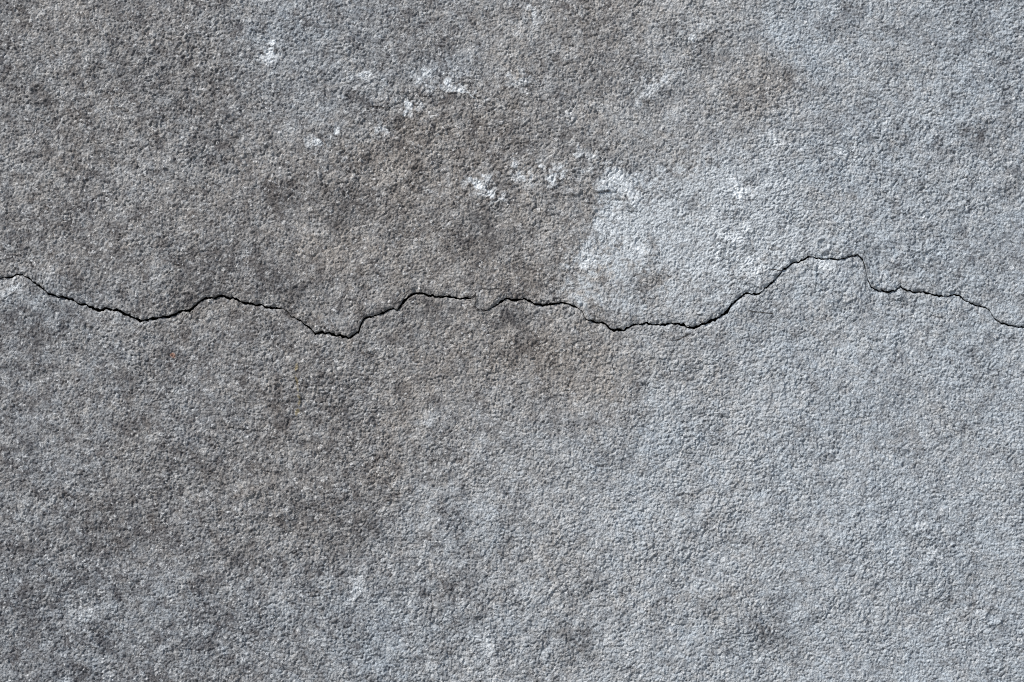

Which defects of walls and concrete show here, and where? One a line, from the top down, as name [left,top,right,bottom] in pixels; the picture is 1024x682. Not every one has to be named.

crack [0,254,1024,341]